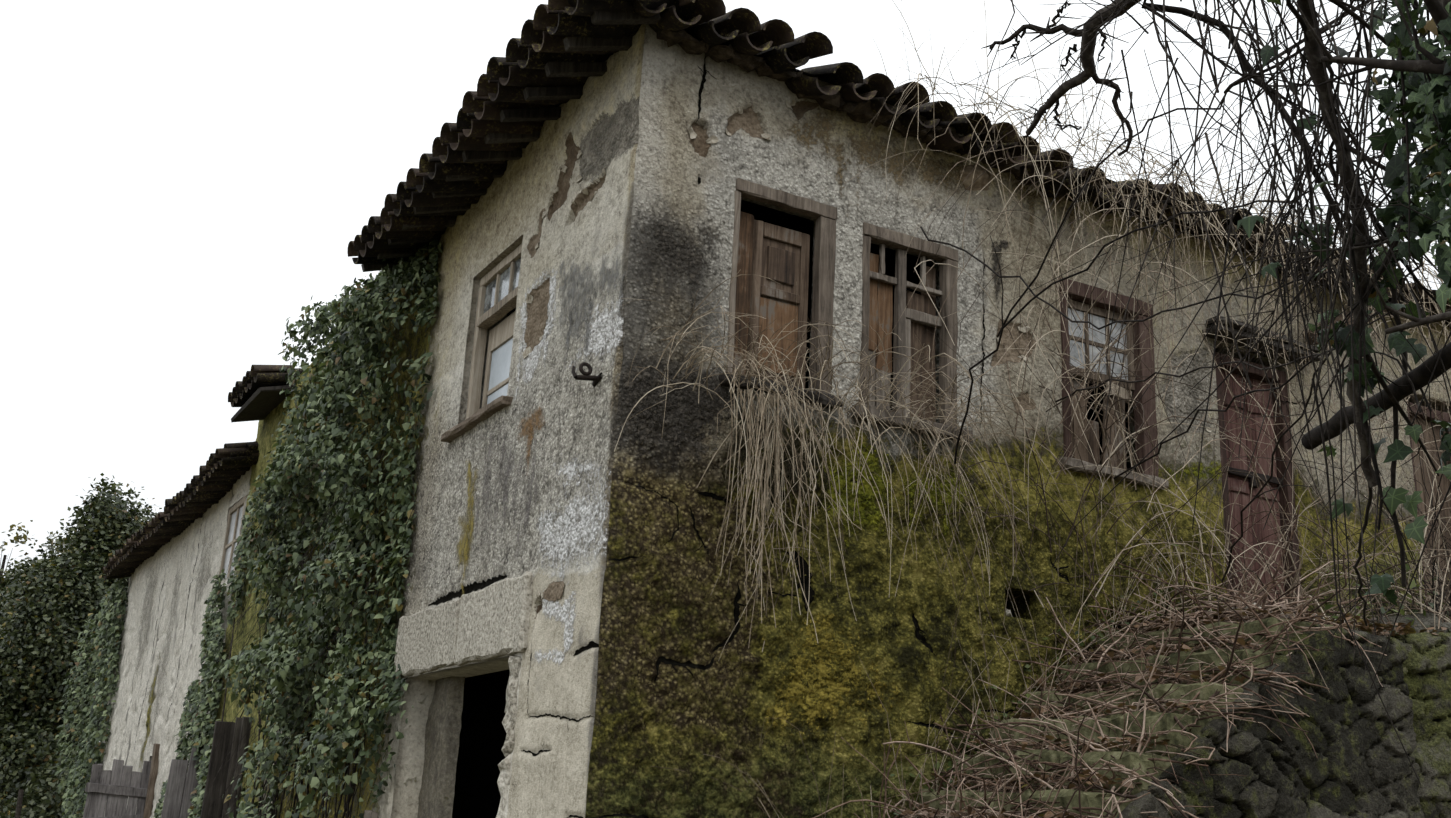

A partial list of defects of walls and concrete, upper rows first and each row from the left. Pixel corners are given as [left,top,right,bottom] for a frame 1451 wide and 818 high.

crack [696,57,716,122]
spalling [687,105,771,157]
flaking render [527,96,640,258]
peeling [523,278,550,359]
leakage [517,458,611,581]
crack [428,574,508,606]
crack [573,641,599,656]
crack [523,628,593,756]